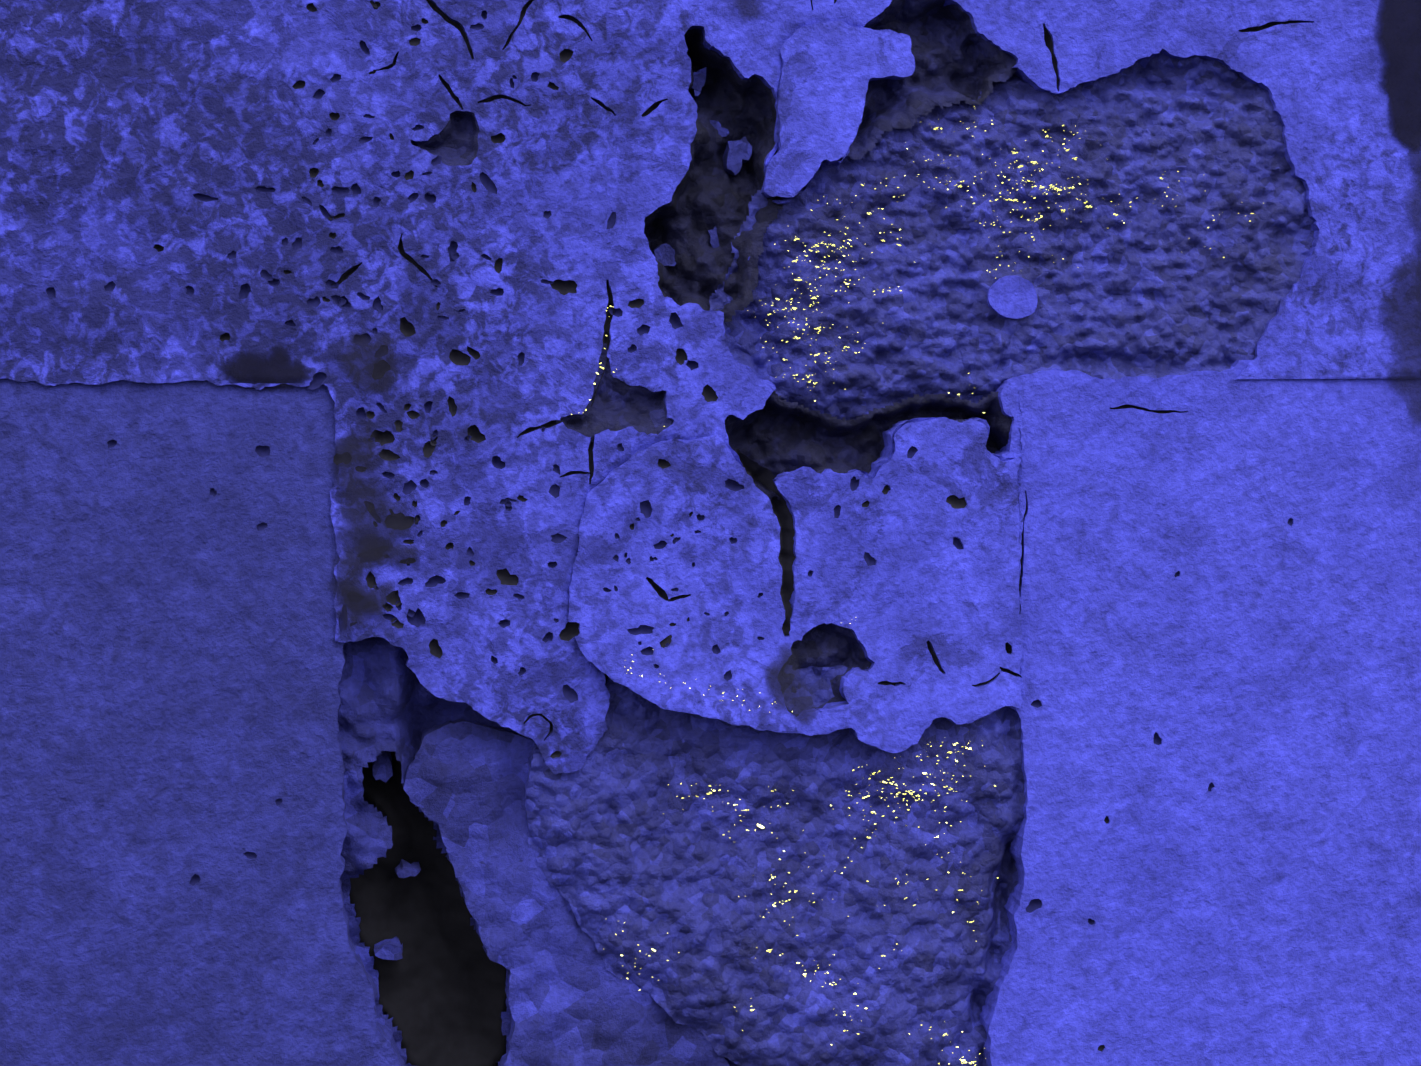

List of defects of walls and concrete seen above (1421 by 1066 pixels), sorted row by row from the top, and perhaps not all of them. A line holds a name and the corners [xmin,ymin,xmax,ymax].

spalling [302,168,381,255]
spalling [644,0,1314,507]
spalling [307,280,383,344]
spalling [449,346,480,366]
spalling [541,279,577,295]
spalling [606,299,650,353]
spalling [541,335,674,452]
crack [735,448,796,636]
crack [1019,494,1027,592]
crack [646,577,690,602]
crack [878,679,903,687]
crack [927,641,1021,686]